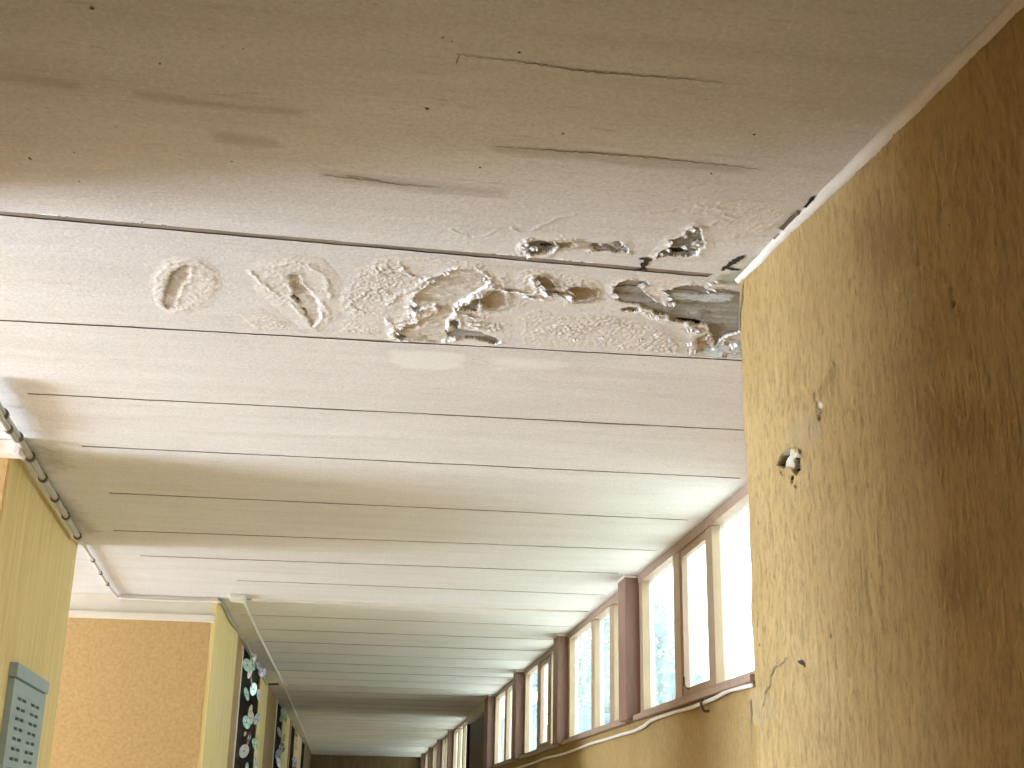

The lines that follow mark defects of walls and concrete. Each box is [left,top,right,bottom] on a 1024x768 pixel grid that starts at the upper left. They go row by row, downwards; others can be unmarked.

crack [456,54,722,83]
crack [496,146,760,170]
spalling [511,230,634,260]
peeling [338,255,576,346]
spalling [603,220,742,359]
spalling [769,440,811,492]